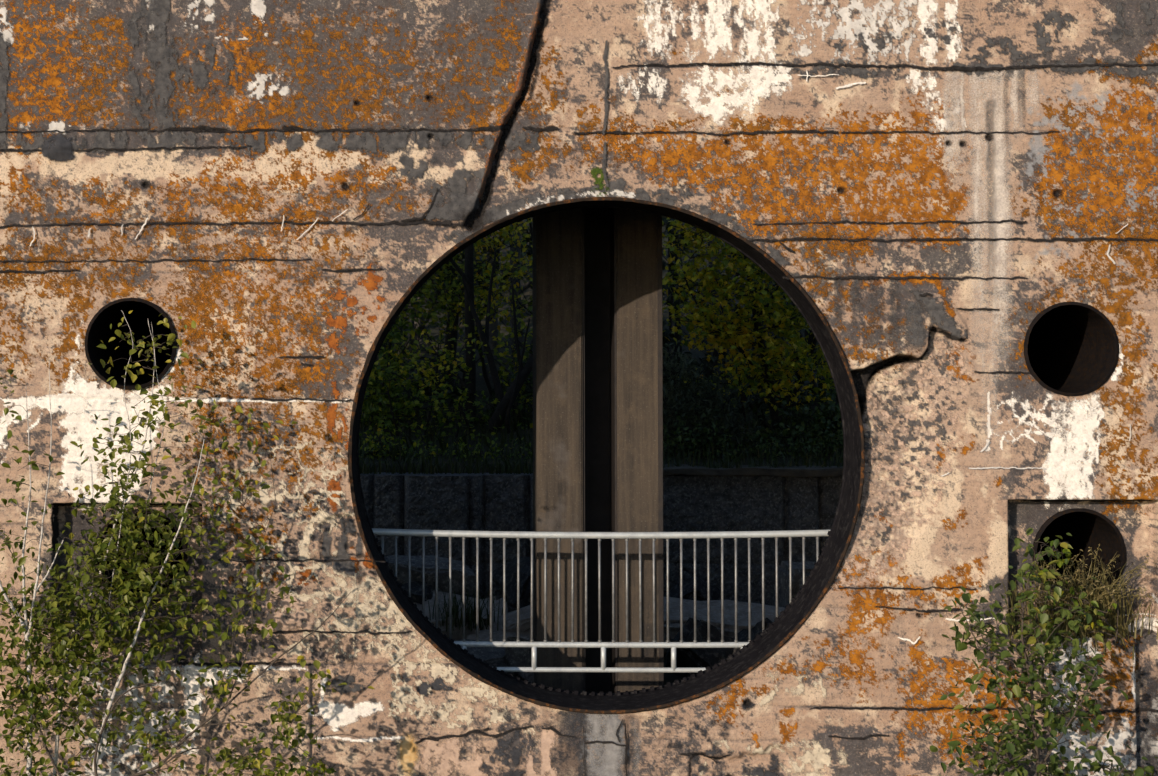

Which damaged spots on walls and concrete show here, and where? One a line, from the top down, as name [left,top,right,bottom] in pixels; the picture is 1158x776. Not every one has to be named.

crack [0,0,1158,274]
leakage [618,0,1158,370]
rust [323,264,385,355]
leakage [0,321,352,510]
crack [250,395,352,403]
spalling [830,290,972,588]
leakage [985,392,1105,510]
rust [298,565,316,586]
rust [350,547,374,573]
crack [1125,593,1158,632]
peeling [741,673,834,710]
peeling [713,739,847,776]